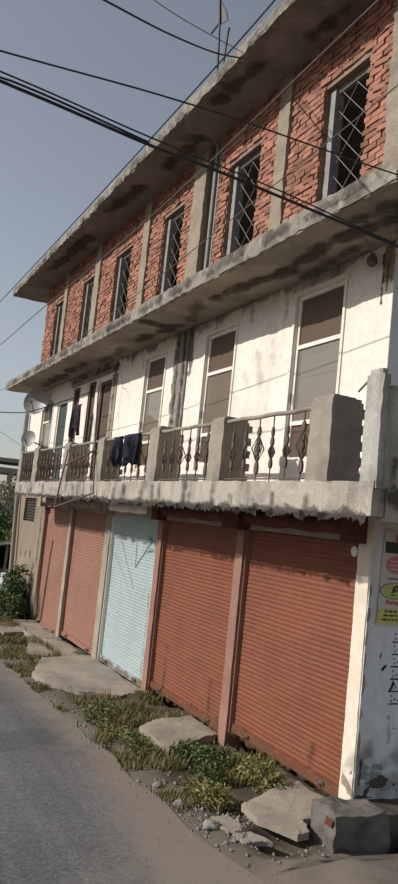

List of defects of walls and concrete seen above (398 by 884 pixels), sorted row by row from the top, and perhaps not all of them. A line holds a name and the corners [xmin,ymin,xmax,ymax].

water stain [18,236,96,287]
water stain [43,203,398,428]
flaking render [361,584,372,696]
flaking render [341,732,395,799]